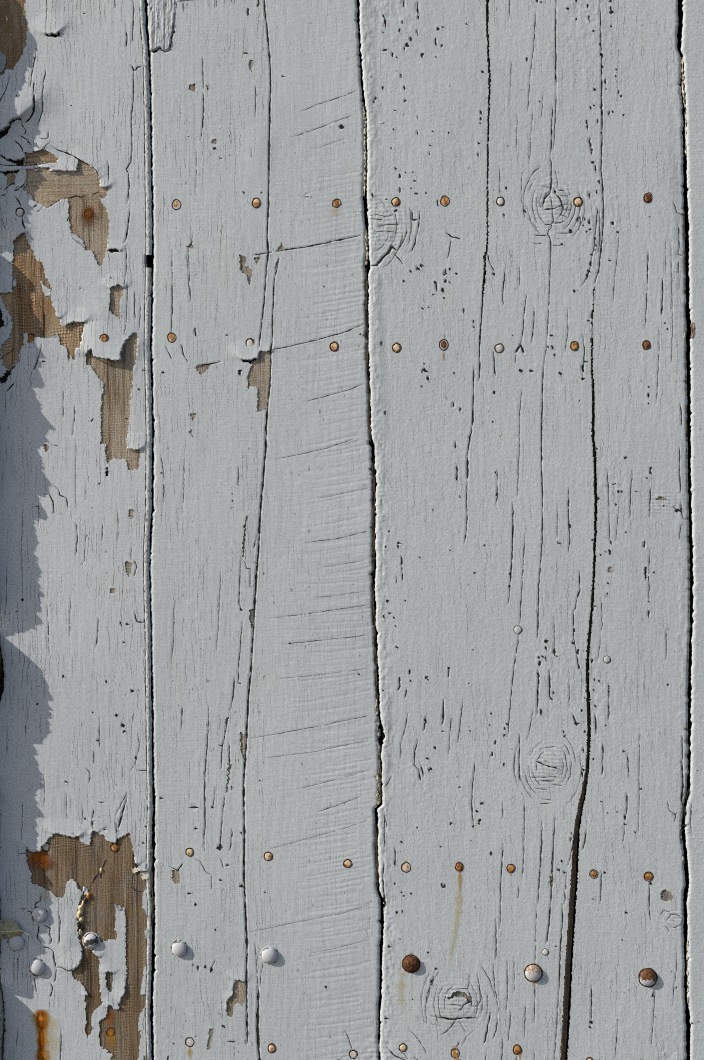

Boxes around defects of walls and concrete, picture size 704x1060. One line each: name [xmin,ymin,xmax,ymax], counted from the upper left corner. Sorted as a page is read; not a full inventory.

peeling [0,0,28,76]
peeling [0,149,109,266]
peeling [0,232,144,471]
crack [0,0,220,640]
peeling [238,351,270,412]
crack [607,204,684,540]
crack [171,0,420,1060]
crack [385,0,640,1060]
crack [65,717,148,897]
rust [33,1011,52,1060]
peeling [25,818,148,1060]
peeling [196,980,246,1050]